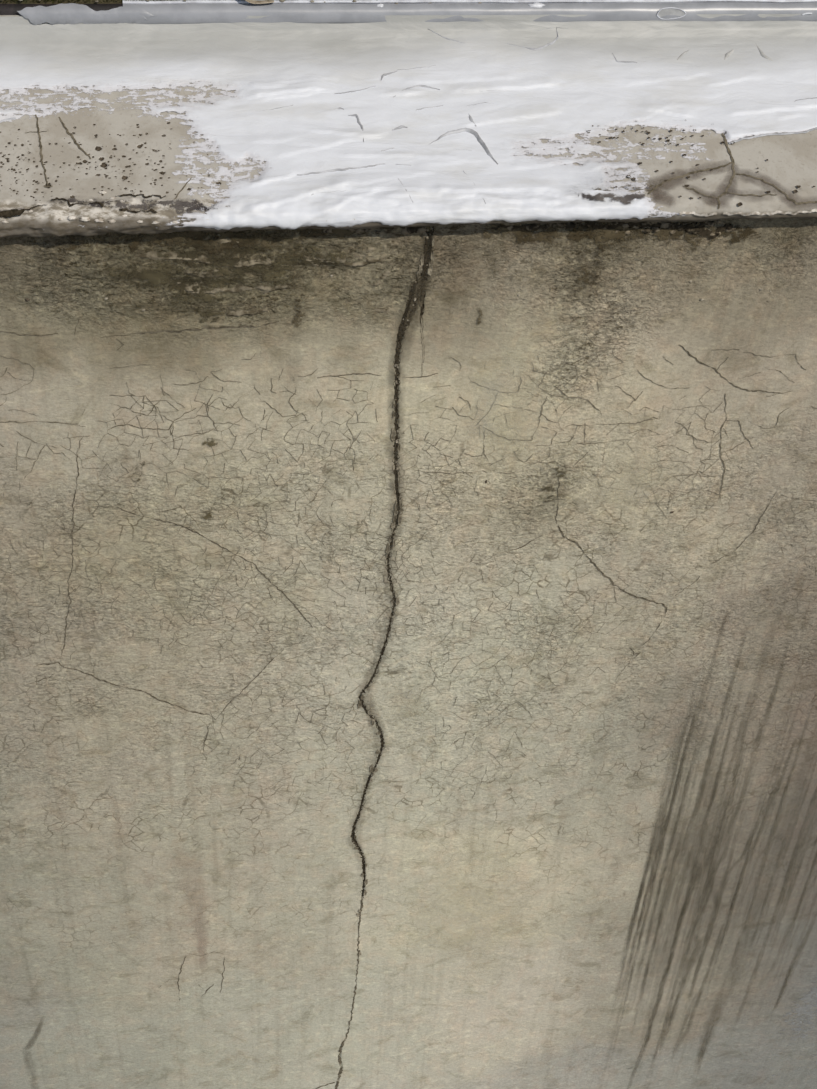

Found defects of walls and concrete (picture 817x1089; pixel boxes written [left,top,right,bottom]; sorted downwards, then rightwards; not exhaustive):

spalling [0,122,221,224]
spalling [587,125,704,181]
spalling [400,226,427,234]
spalling [491,176,817,239]
crack [0,226,817,1089]